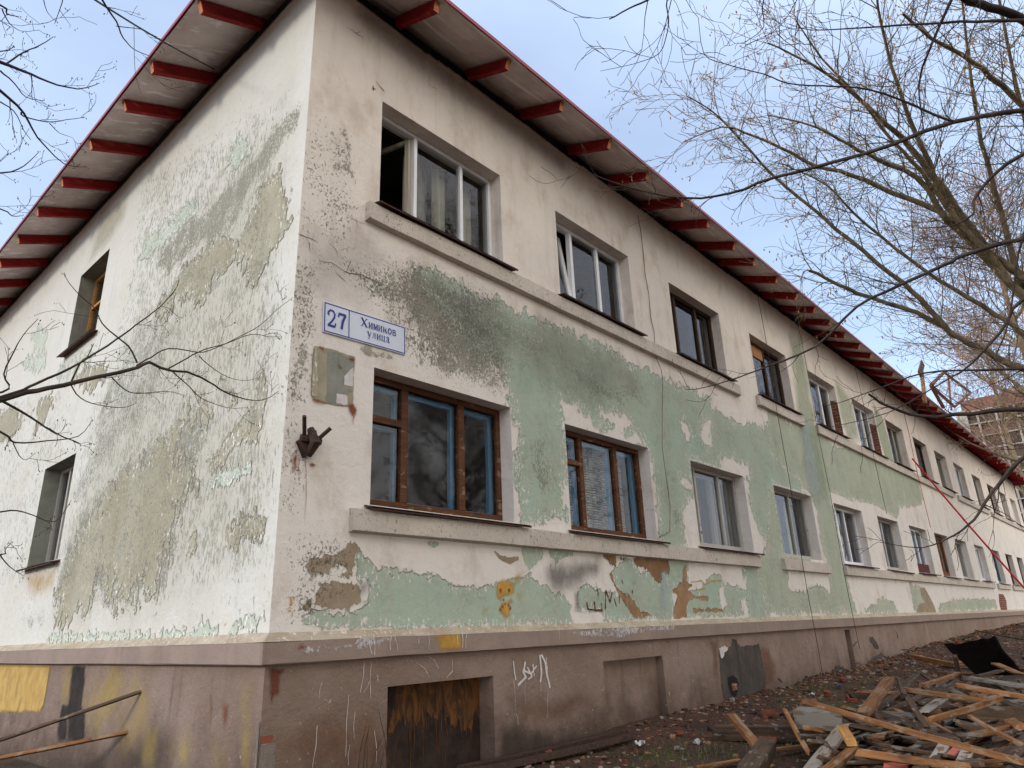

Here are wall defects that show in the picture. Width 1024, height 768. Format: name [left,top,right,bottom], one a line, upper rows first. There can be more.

peeling [137,197,198,261]
peeling [154,162,295,329]
peeling [46,368,267,644]
peeling [301,262,923,631]
peeling [909,581,1007,613]
spalling [728,675,739,697]